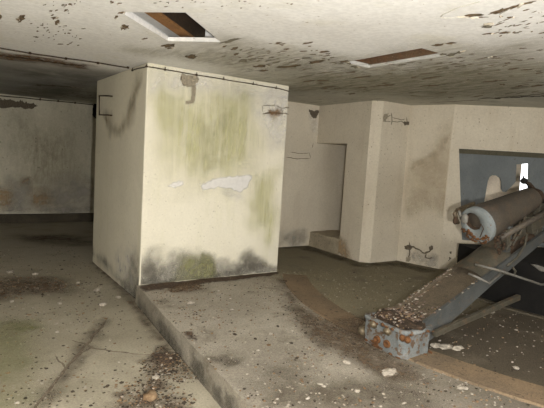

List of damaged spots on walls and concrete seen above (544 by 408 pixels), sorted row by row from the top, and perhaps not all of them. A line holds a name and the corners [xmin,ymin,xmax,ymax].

peeling [30,0,82,46]
peeling [219,38,395,95]
peeling [389,50,473,98]
spalling [0,98,37,109]
peeling [202,175,252,192]
leakage [125,254,278,295]
crack [34,318,150,408]